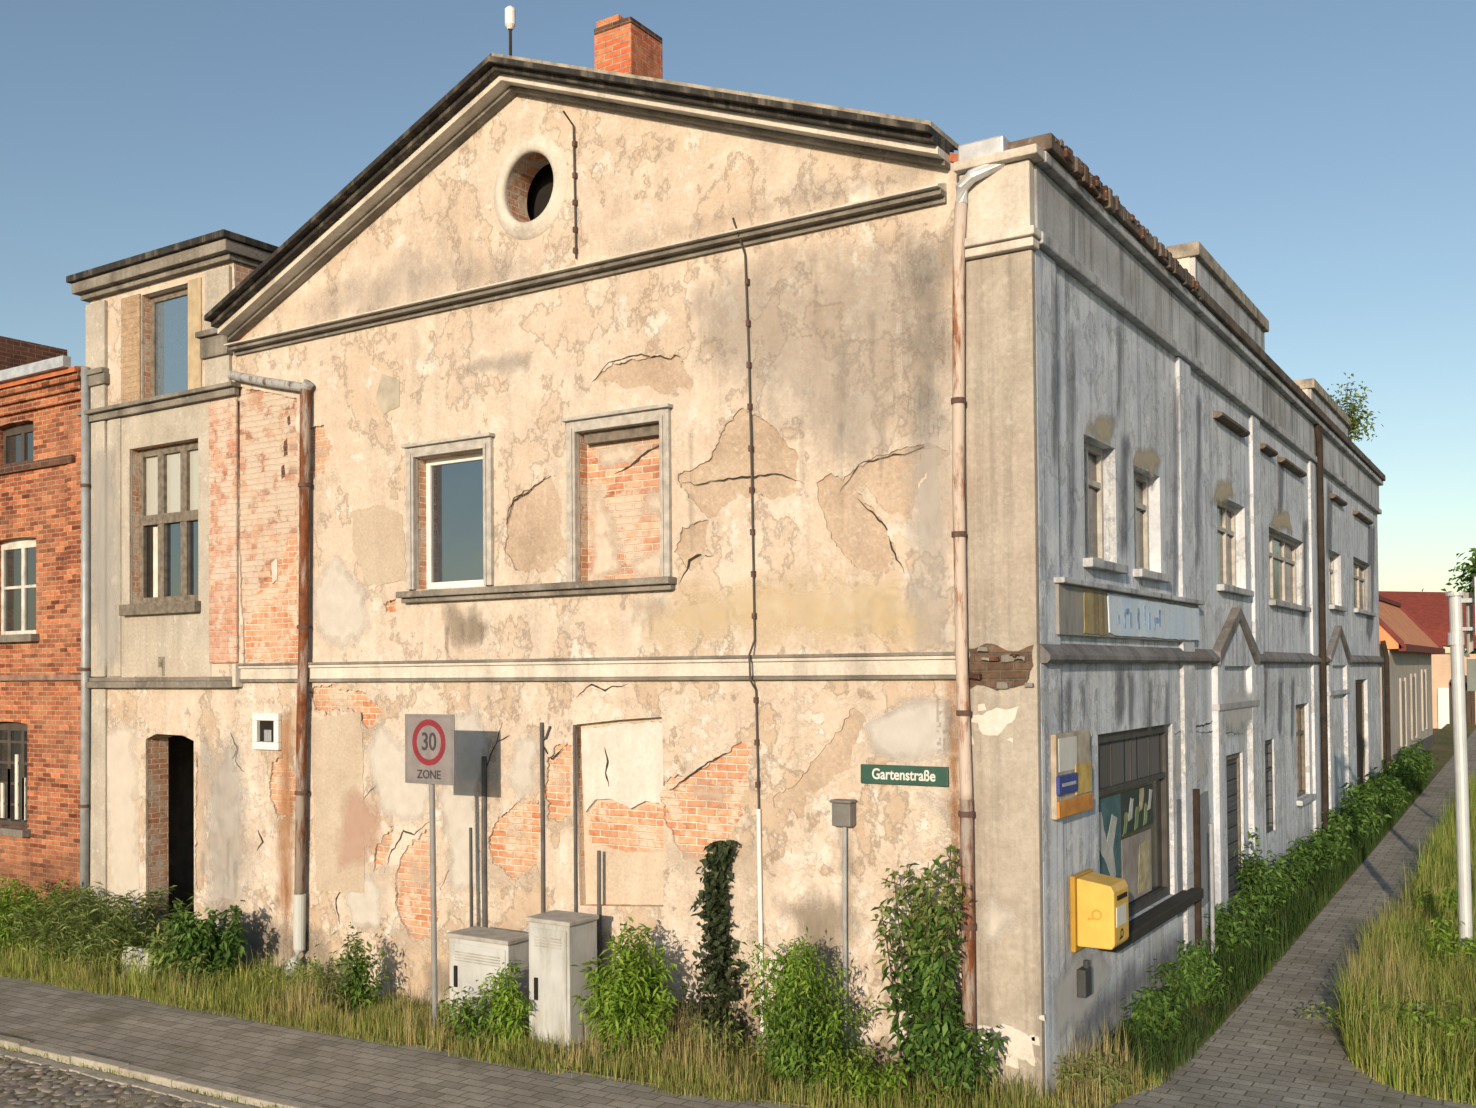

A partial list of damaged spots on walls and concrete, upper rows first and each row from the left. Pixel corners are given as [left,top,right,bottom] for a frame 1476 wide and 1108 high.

flaking render [594,350,694,395]
flaking render [238,387,366,663]
flaking render [506,477,567,575]
flaking render [675,408,950,576]
flaking render [260,721,296,825]
flaking render [311,685,754,944]